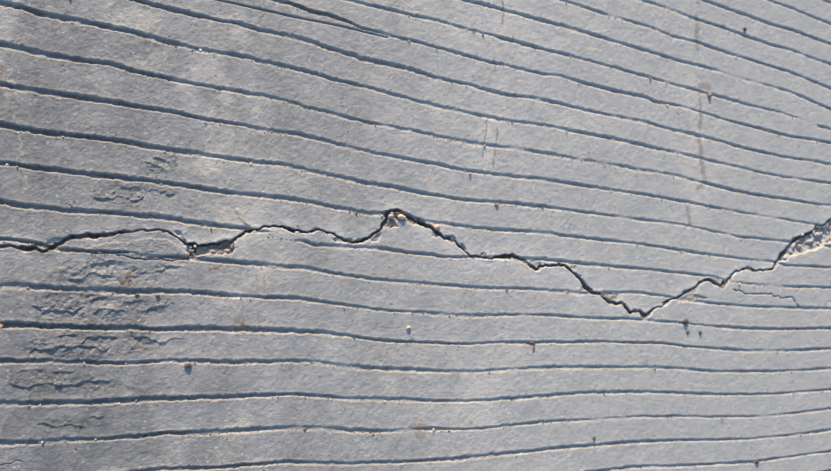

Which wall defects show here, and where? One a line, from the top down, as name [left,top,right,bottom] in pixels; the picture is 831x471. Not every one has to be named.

spalling [186,242,235,258]
crack [0,208,831,319]
spalling [776,220,831,261]